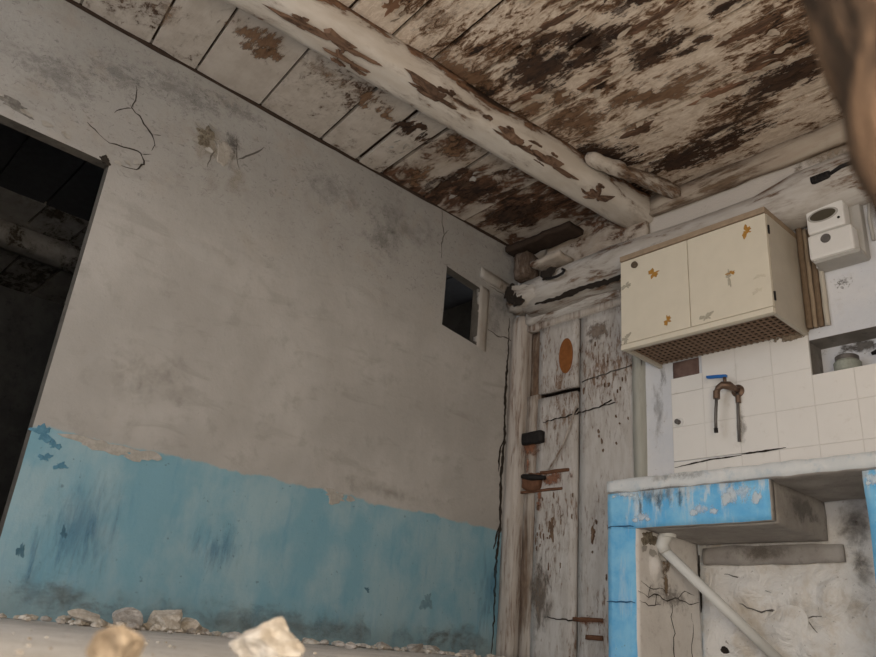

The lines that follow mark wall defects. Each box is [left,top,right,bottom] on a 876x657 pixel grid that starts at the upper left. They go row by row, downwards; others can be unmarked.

peeling [263,4,383,76]
peeling [520,0,587,55]
peeling [612,0,689,43]
peeling [715,8,781,49]
peeling [508,64,634,109]
peeling [687,43,795,107]
crack [87,87,161,170]
peeling [404,68,615,202]
peeling [619,117,663,143]
peeling [28,423,162,469]
crack [488,319,511,654]
crack [607,555,702,657]